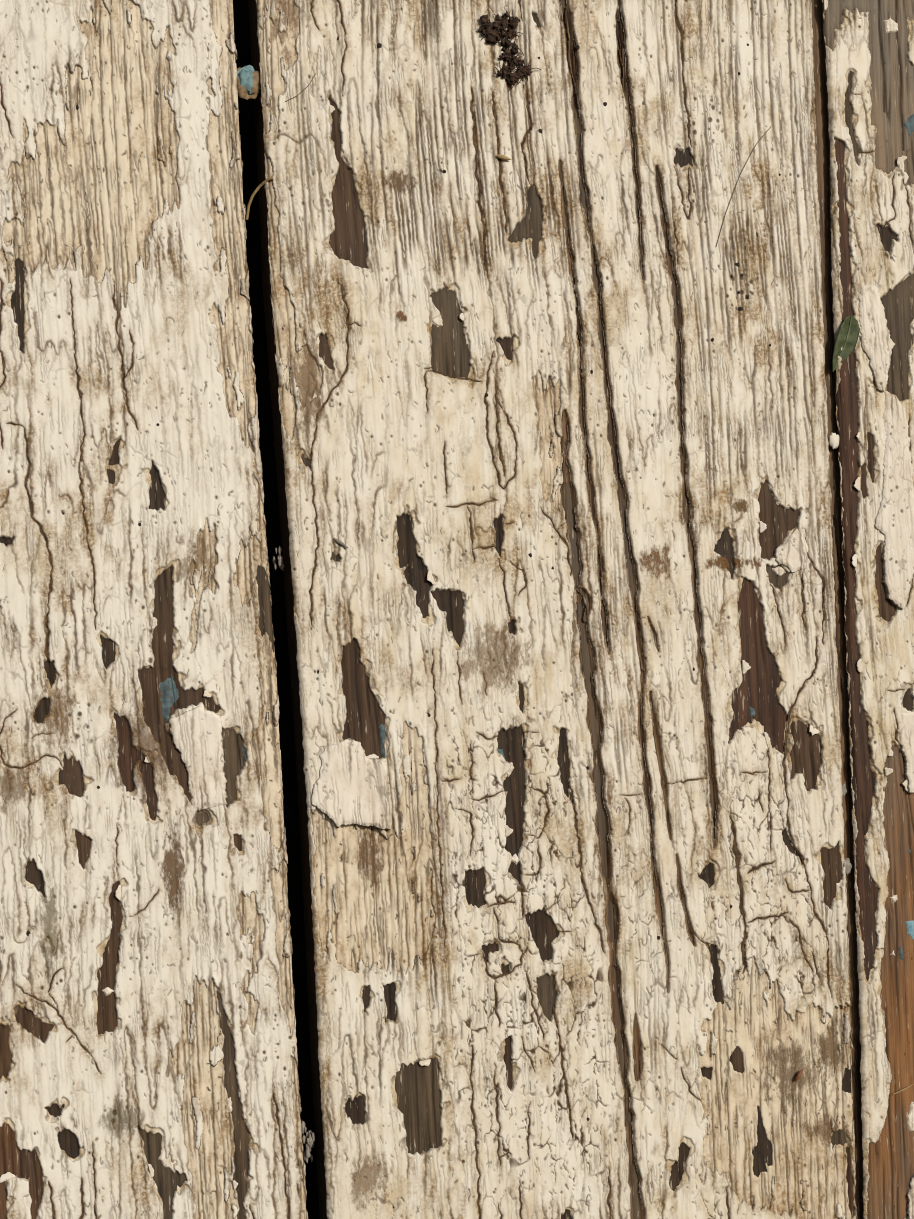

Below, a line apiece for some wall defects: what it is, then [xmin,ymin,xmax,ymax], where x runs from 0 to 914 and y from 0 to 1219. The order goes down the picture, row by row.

peeling [822,0,914,186]
crack [0,422,53,663]
crack [70,280,97,629]
crack [309,282,360,630]
peeling [397,514,464,647]
crack [424,352,527,622]
peeling [669,71,914,1219]
peeling [114,476,303,1167]
peeling [311,639,435,1023]
crack [431,649,604,1138]
peeling [395,1058,442,1154]
crack [470,1045,531,1219]